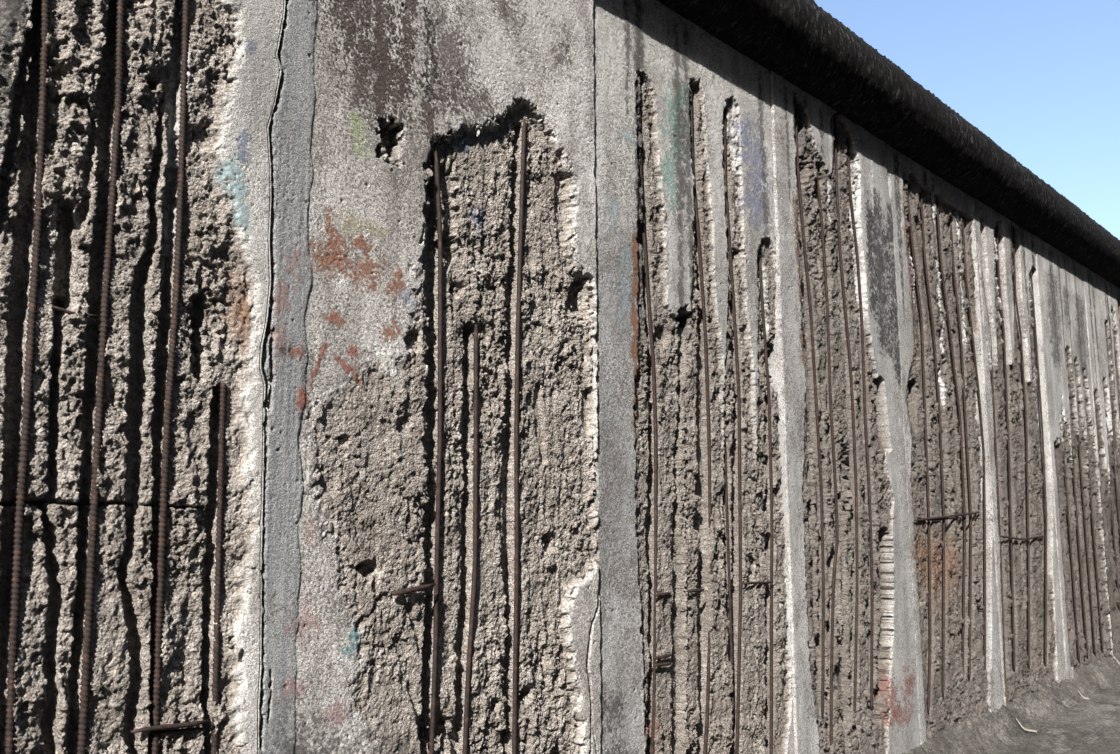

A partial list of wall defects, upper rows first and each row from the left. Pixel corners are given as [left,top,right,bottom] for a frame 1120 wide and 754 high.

crack [0,498,201,508]
spalling [0,0,262,754]
crack [259,0,291,748]
spalling [296,97,598,754]
spalling [633,70,792,754]
spalling [792,89,895,754]
rust [874,665,915,731]
spalling [902,170,1120,739]